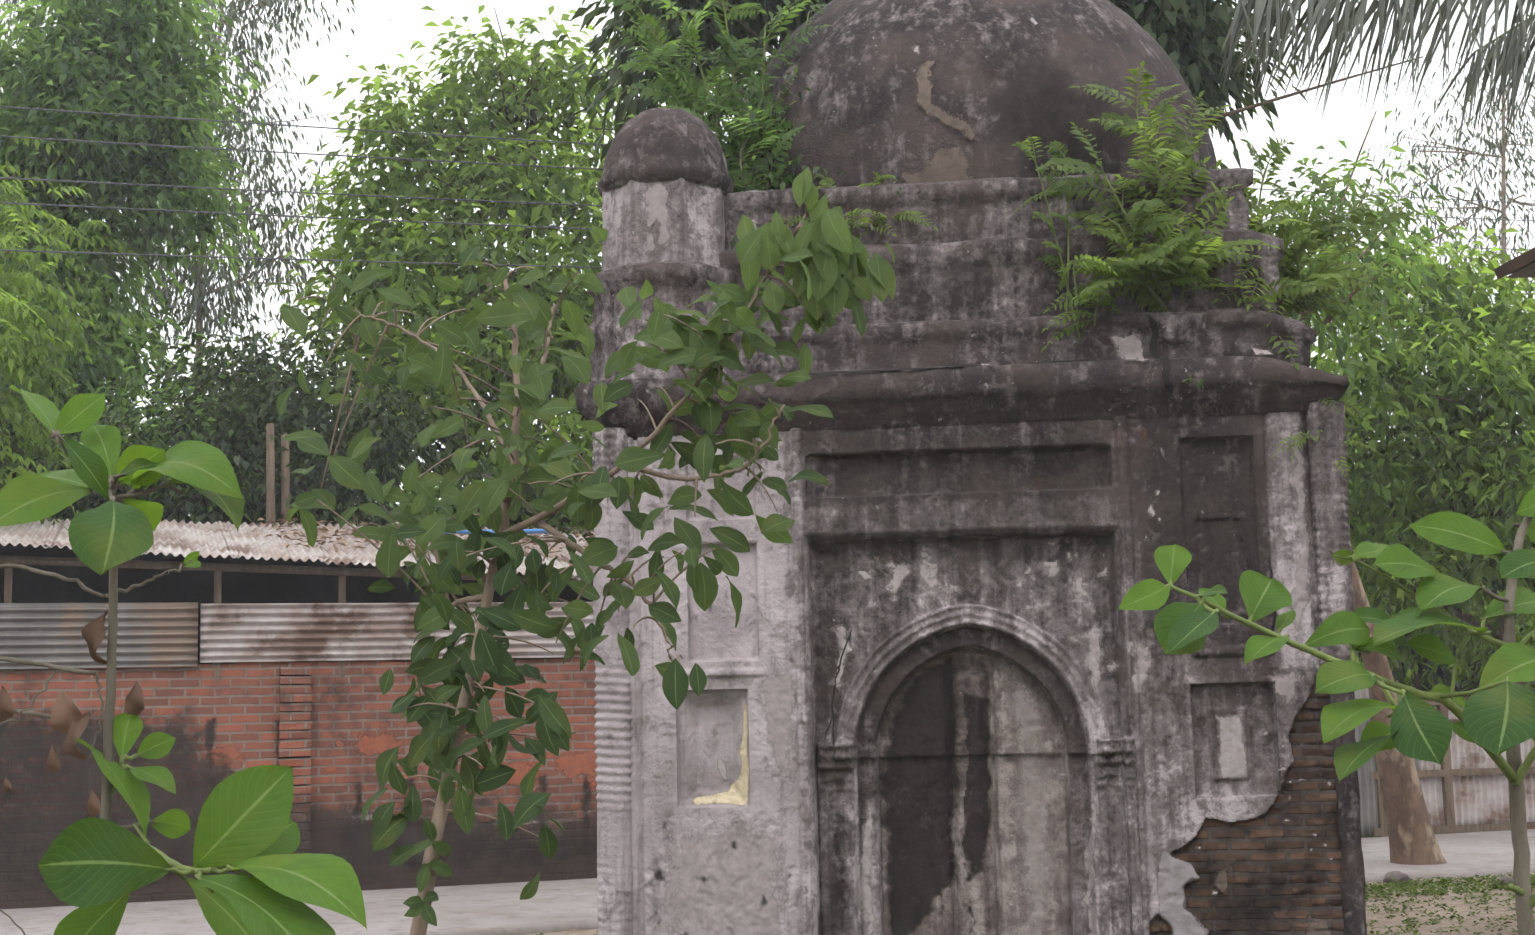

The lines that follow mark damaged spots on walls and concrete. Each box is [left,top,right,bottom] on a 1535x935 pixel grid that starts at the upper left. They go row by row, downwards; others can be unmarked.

flaking render [1288,430,1310,652]
leakage [879,657,992,935]
spalling [1149,672,1344,935]